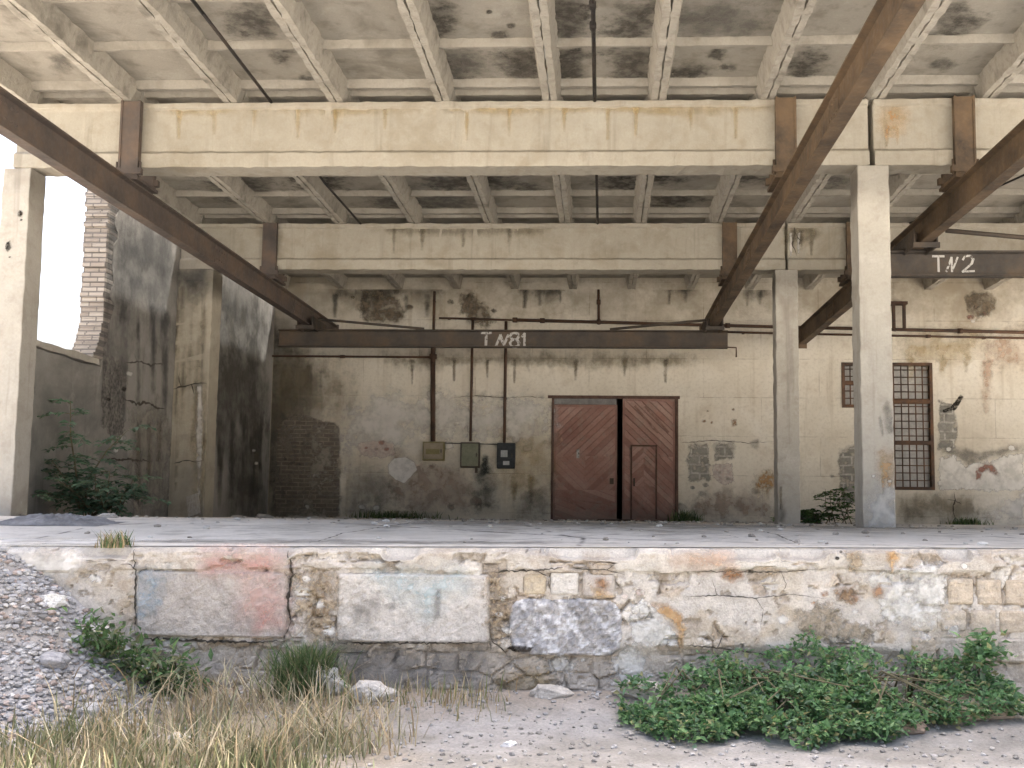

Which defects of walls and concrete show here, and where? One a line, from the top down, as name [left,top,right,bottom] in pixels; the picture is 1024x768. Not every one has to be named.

water stain [500,51,537,79]
water stain [555,1,590,79]
water stain [603,4,655,38]
water stain [671,49,733,78]
spalling [351,289,413,322]
spalling [965,292,995,323]
crack [122,356,202,409]
spalling [273,392,551,517]
spalling [687,443,768,519]
spalling [938,395,992,462]
crack [690,568,827,622]
rust [655,606,684,645]